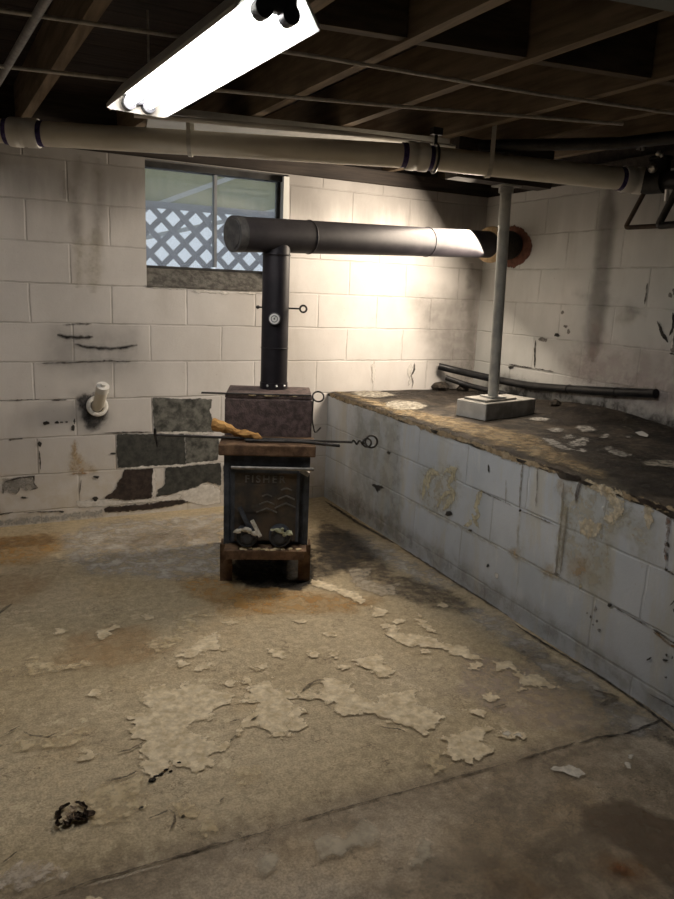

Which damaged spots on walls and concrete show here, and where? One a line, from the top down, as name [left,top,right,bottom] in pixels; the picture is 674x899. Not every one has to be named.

peeling [657,313,674,355]
peeling [2,442,42,494]
peeling [92,397,224,513]
peeling [330,392,674,539]
peeling [146,611,238,672]
peeling [80,648,527,837]
crack [42,694,674,899]
peeling [551,765,585,778]